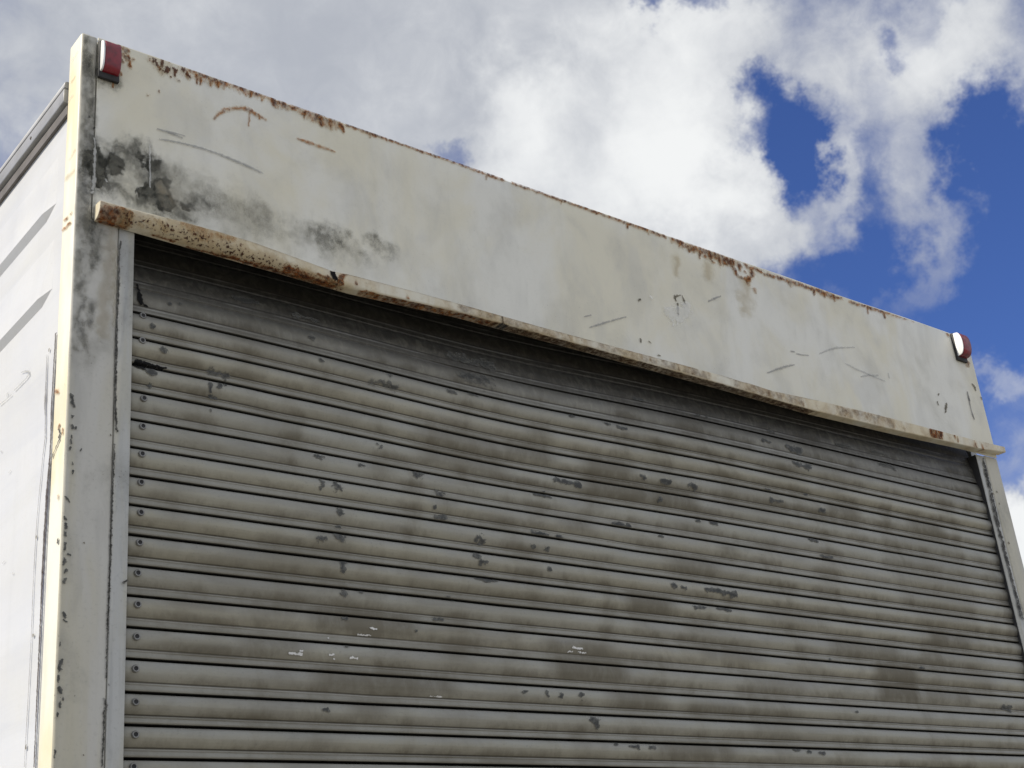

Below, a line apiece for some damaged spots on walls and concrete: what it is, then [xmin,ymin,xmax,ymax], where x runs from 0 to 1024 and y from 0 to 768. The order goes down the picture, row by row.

mould [78,121,120,203]
rust [149,57,914,322]
rust [97,205,812,414]
peeling [69,393,82,474]
peeling [62,516,71,584]
peeling [473,533,498,582]
peeling [56,659,64,717]